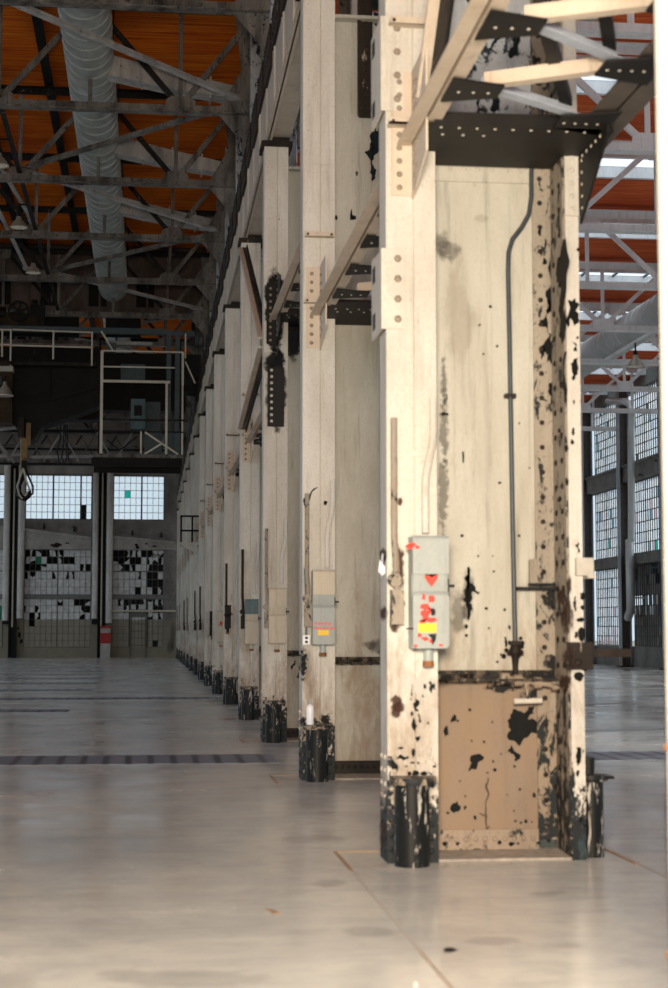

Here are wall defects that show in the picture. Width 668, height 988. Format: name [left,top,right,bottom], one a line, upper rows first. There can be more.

peeling [508,37,521,58]
peeling [476,97,500,113]
peeling [365,127,379,193]
peeling [538,229,580,408]
peeling [463,566,479,637]
peeling [468,706,537,773]
peeling [446,795,477,820]